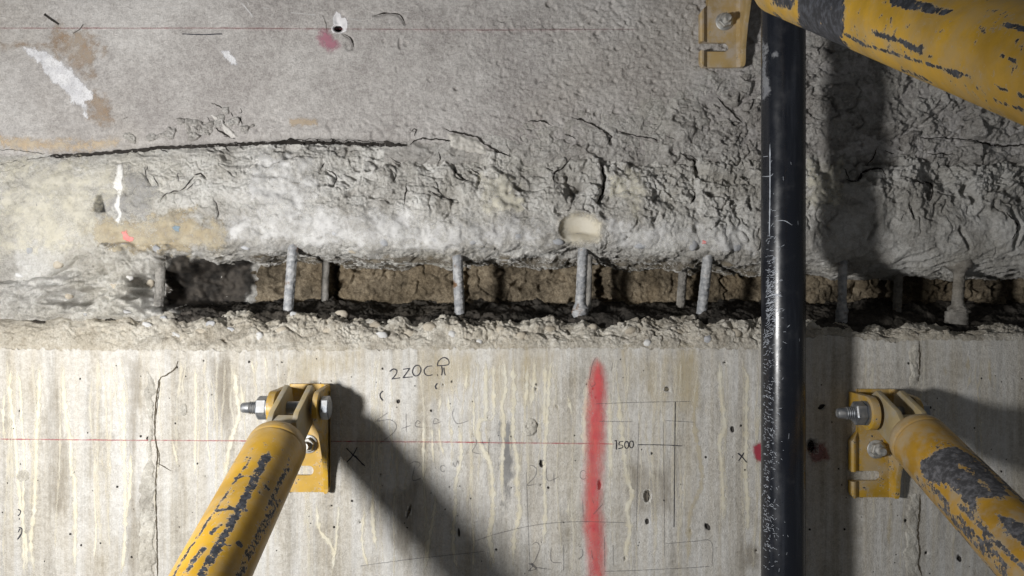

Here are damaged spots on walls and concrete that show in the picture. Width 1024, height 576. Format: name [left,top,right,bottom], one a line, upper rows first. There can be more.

crack [0,103,511,204]
crack [528,117,698,204]
crack [717,97,742,142]
crack [922,137,1024,155]
spalling [0,243,761,353]
spalling [806,319,1024,343]
damp [1,367,42,569]
damp [58,370,78,563]
crack [154,361,178,575]
damp [178,358,291,489]
damp [422,362,589,567]
damp [608,365,685,572]